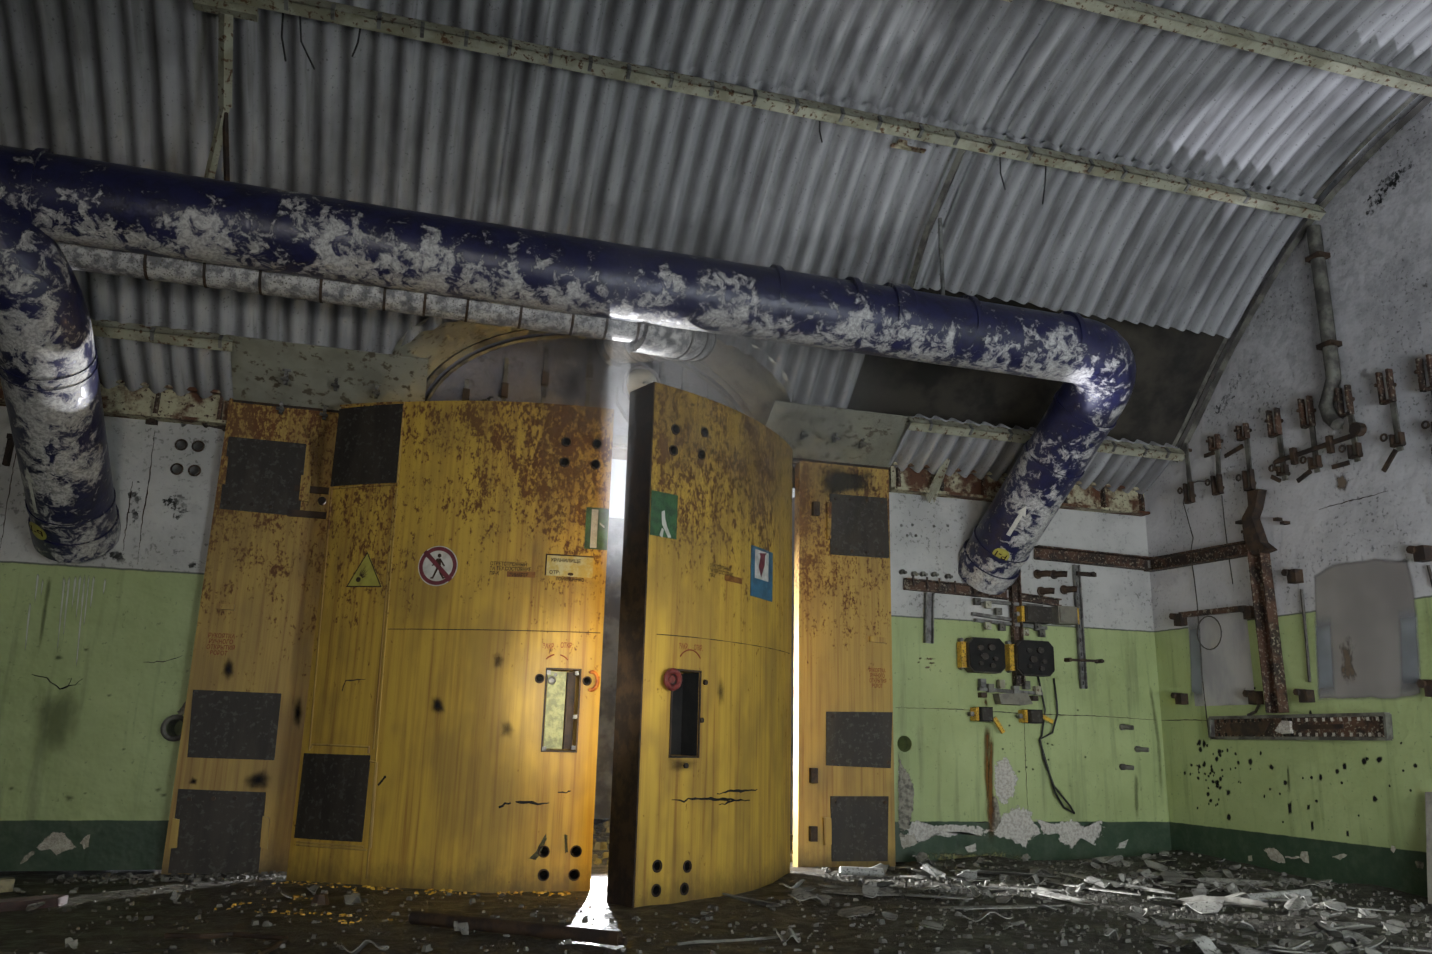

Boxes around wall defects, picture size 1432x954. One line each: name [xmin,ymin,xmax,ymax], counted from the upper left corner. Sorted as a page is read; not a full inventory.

crack [32,674,82,690]
peeling [898,748,1104,852]
peeling [20,832,90,864]